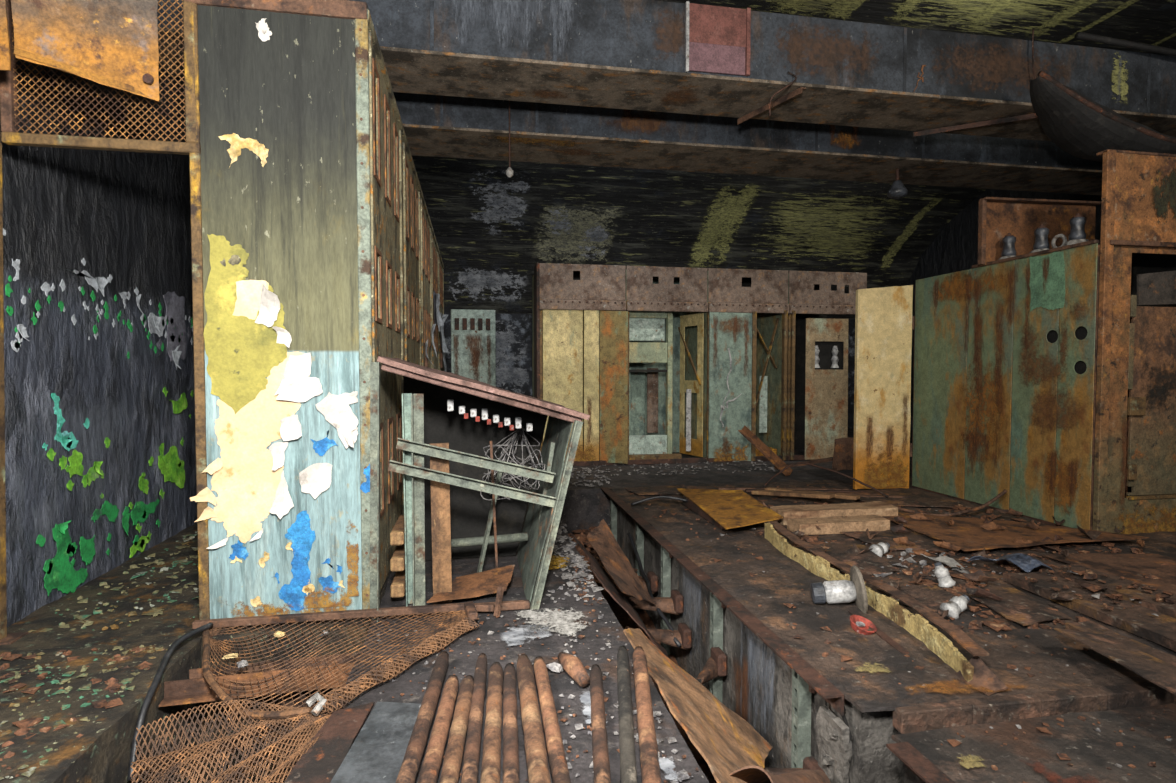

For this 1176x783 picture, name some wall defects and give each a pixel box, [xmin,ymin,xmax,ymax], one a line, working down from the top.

peeling [255,18,272,41]
peeling [218,133,269,167]
efflorescence [471,172,530,234]
damp [535,206,619,263]
damp [691,185,760,267]
damp [749,191,919,268]
corrosion [713,317,749,370]
corrosion [934,268,1085,472]
peeling [5,234,358,632]
corrosion [714,438,748,461]
peeling [0,642,183,737]
peeling [0,746,58,781]